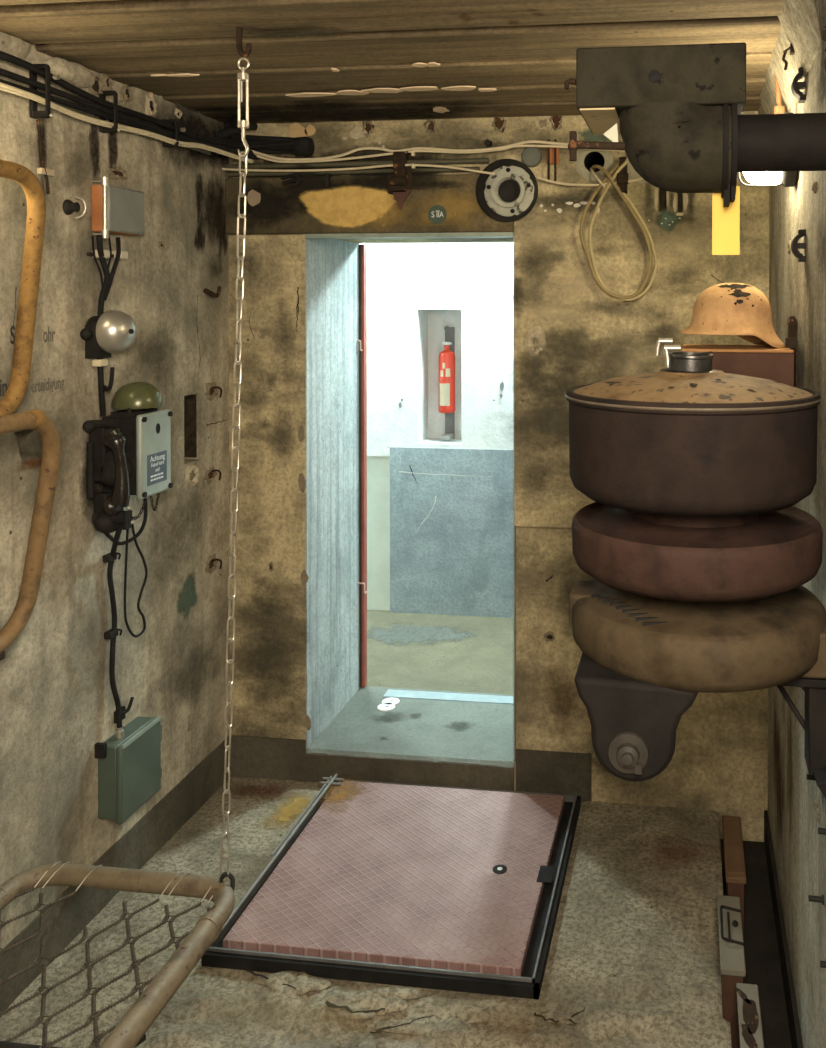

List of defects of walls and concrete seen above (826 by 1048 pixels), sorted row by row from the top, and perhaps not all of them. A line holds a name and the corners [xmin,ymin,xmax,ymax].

water stain [512,284,522,306]
water stain [656,325,672,345]
water stain [519,335,592,437]
water stain [244,598,289,700]
rust [270,797,310,822]
spalling [256,971,446,1035]